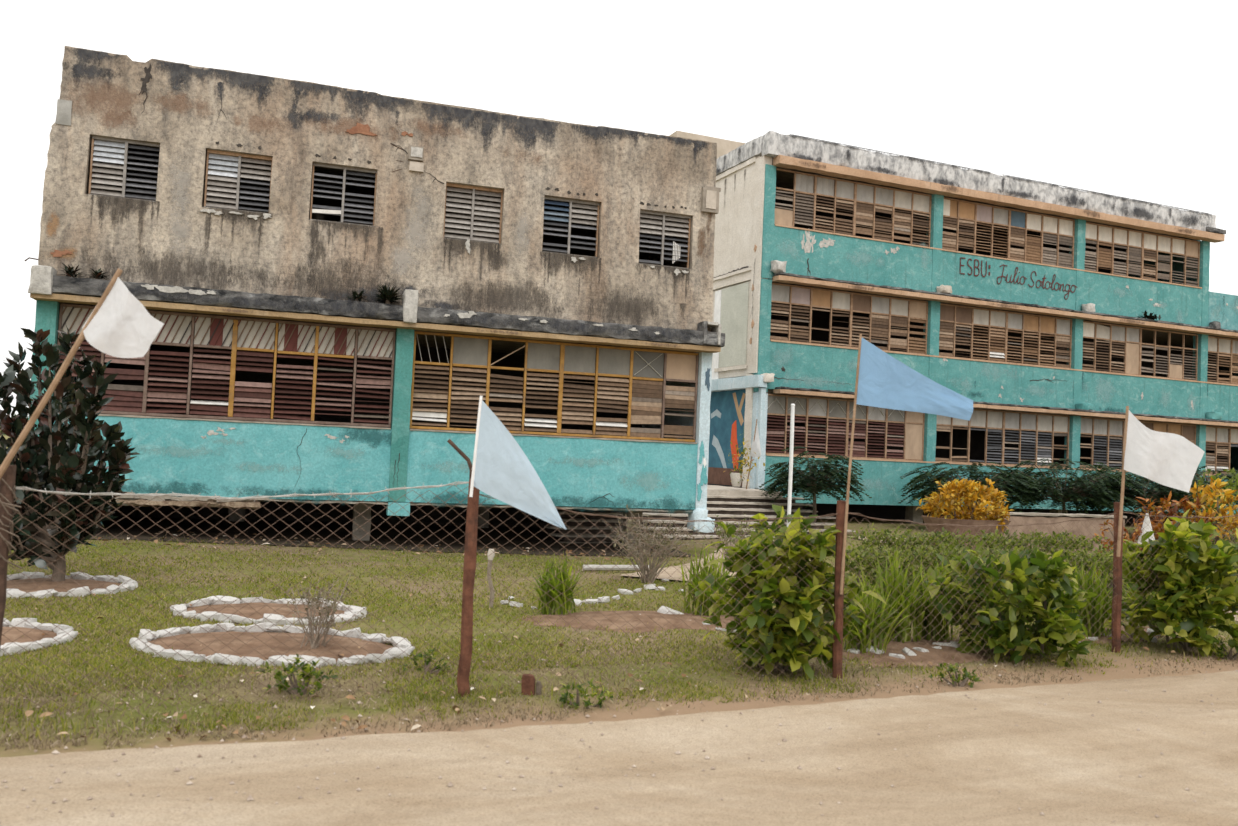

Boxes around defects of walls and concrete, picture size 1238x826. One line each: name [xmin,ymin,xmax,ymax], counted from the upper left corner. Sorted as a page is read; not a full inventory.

water stain [63,48,120,90]
water stain [157,61,275,107]
water stain [288,81,559,149]
water stain [574,125,707,163]
water stain [788,133,1210,225]
water stain [91,194,159,234]
water stain [205,207,271,244]
peeling [801,230,835,253]
water stain [82,220,702,341]